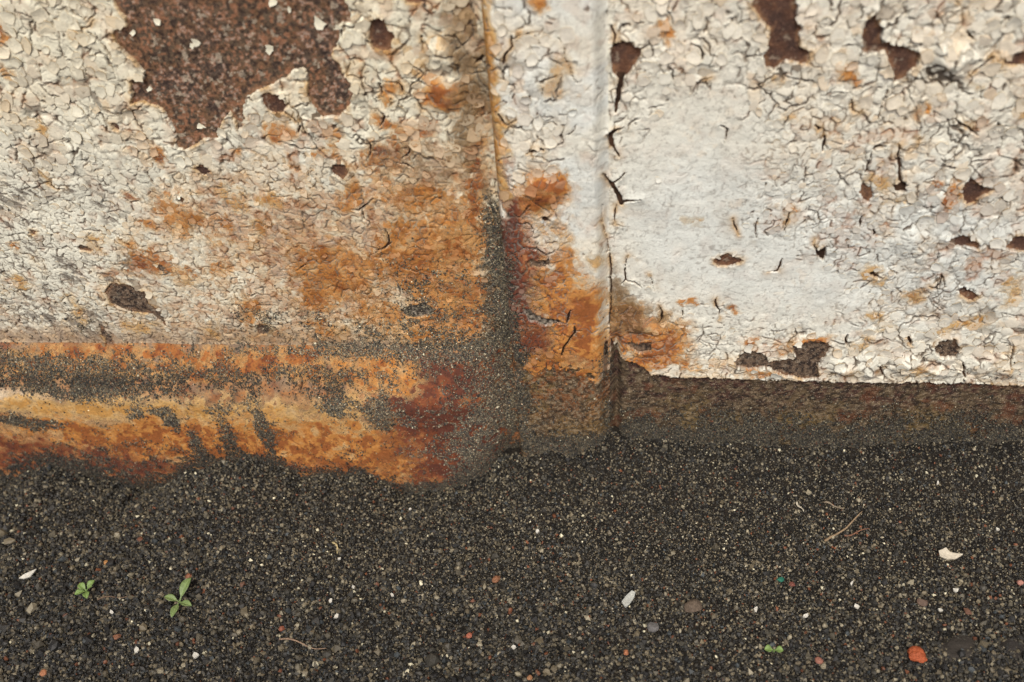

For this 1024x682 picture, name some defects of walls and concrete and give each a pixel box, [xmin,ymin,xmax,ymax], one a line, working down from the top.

crack [456,35,517,64]
crack [368,82,403,157]
crack [815,124,826,151]
peeling [0,0,576,348]
peeling [605,0,1024,386]
crack [865,147,904,185]
crack [358,204,391,250]
rust [0,0,1024,492]
crack [604,72,653,364]
crack [556,310,577,355]
peeling [524,347,570,369]